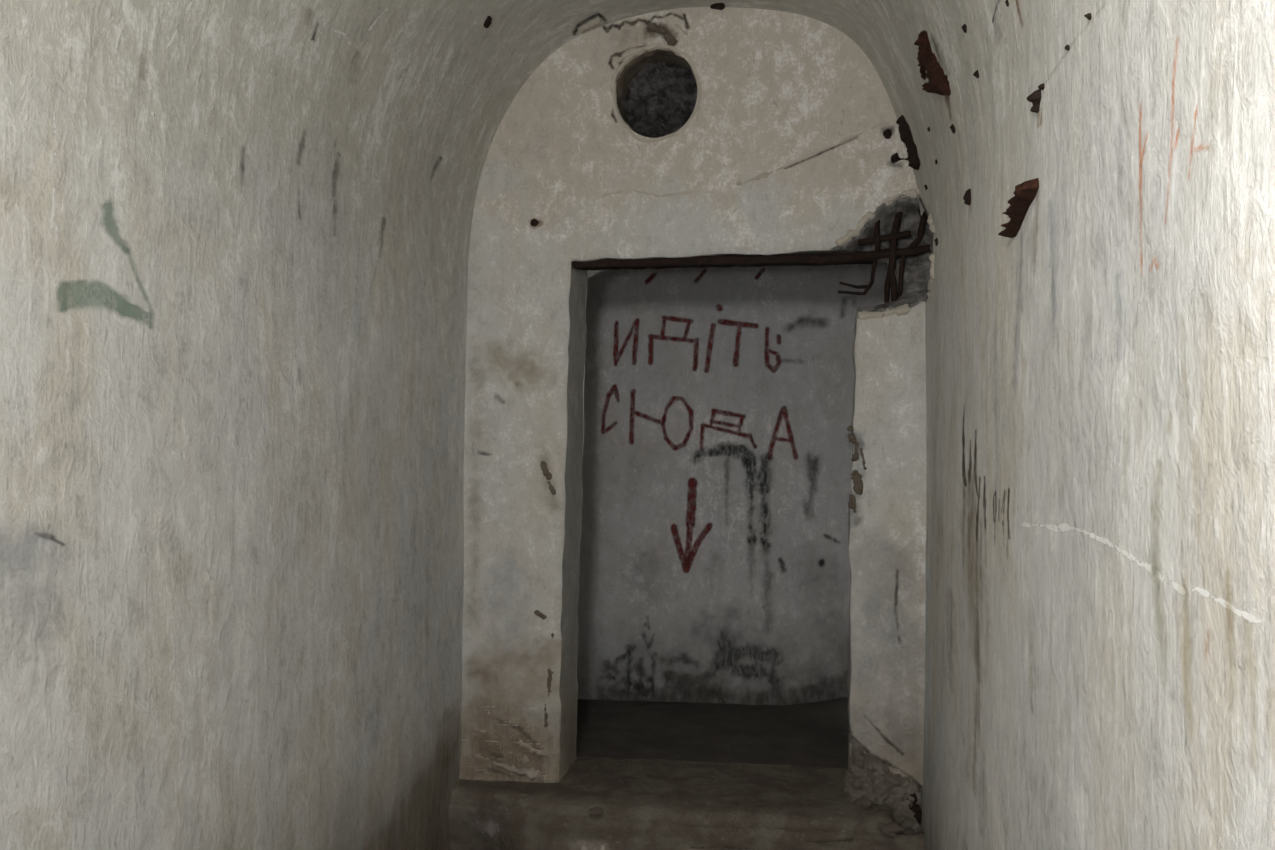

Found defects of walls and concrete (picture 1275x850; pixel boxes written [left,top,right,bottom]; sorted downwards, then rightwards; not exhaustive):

rust [914,30,951,116]
rust [896,115,921,171]
rust [998,178,1039,238]
spalling [818,185,938,320]
leakage [694,445,769,547]
crack [1021,522,1275,624]
leakage [598,632,849,705]